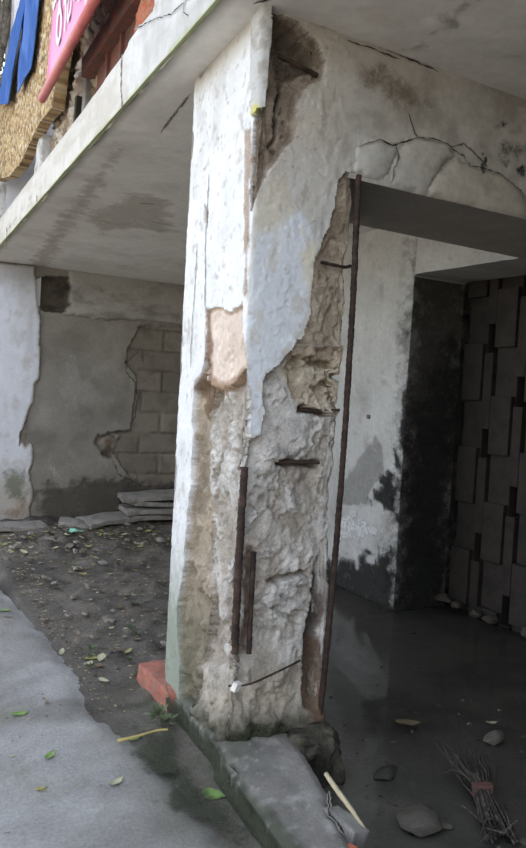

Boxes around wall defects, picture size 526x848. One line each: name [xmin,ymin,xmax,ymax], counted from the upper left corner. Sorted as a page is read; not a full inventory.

crack [134,0,189,30]
crack [117,55,125,108]
crack [360,112,526,199]
hole [36,275,73,314]
spalling [93,432,120,459]
spalling [177,171,361,742]
damp [326,258,471,614]